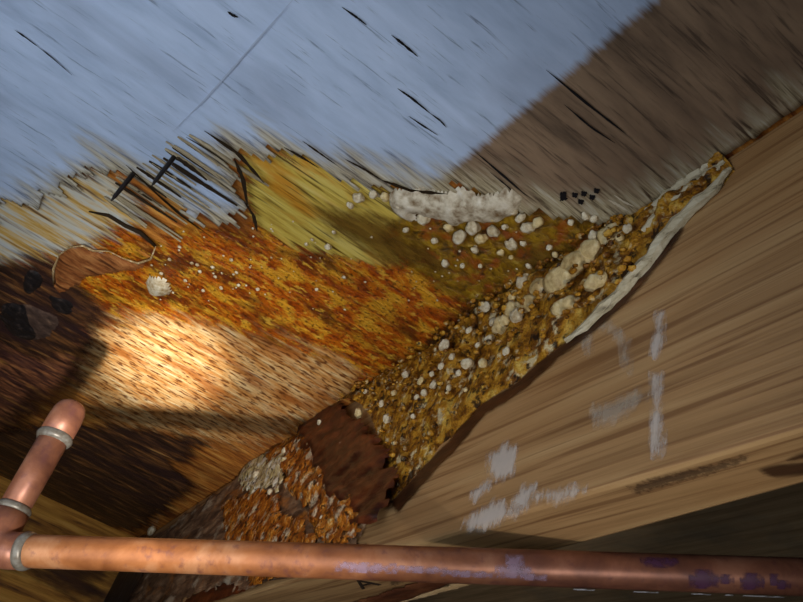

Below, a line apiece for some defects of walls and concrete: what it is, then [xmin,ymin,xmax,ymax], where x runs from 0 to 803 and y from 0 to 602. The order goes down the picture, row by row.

peeling [52,211,156,293]
damp [0,169,605,538]